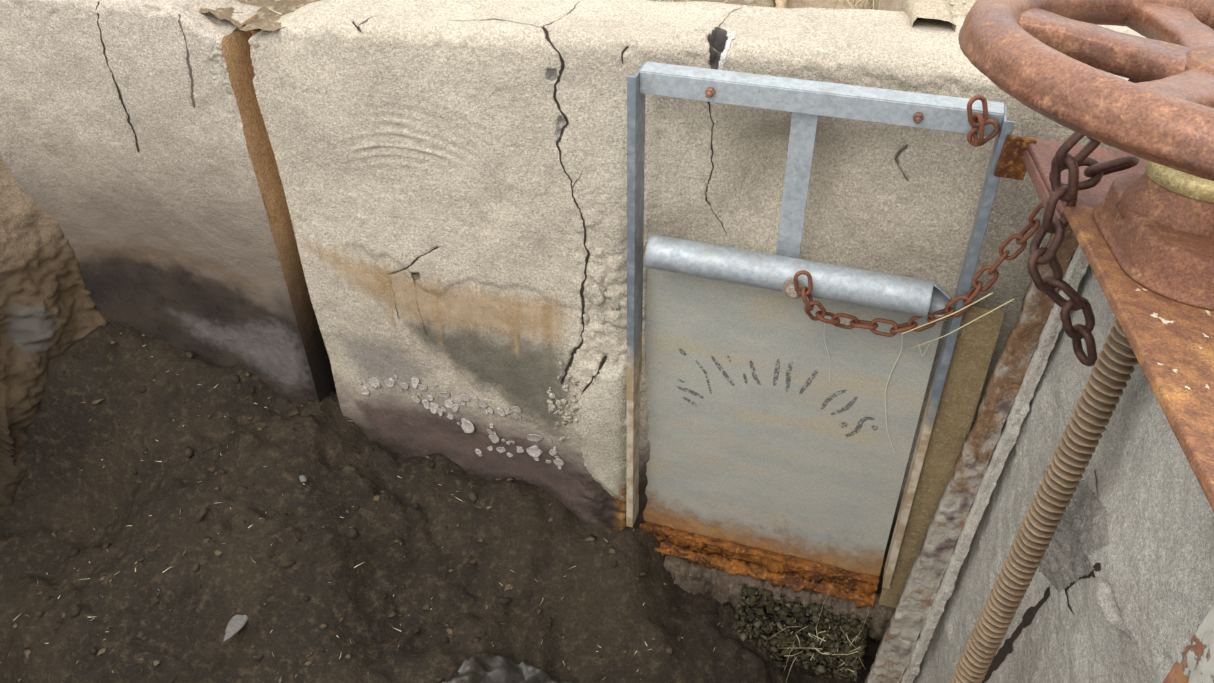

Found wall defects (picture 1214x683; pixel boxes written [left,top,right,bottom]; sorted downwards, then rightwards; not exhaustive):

crack [95,2,139,153]
crack [178,14,195,108]
crack [459,1,607,395]
crack [705,102,727,235]
rust [618,491,883,610]